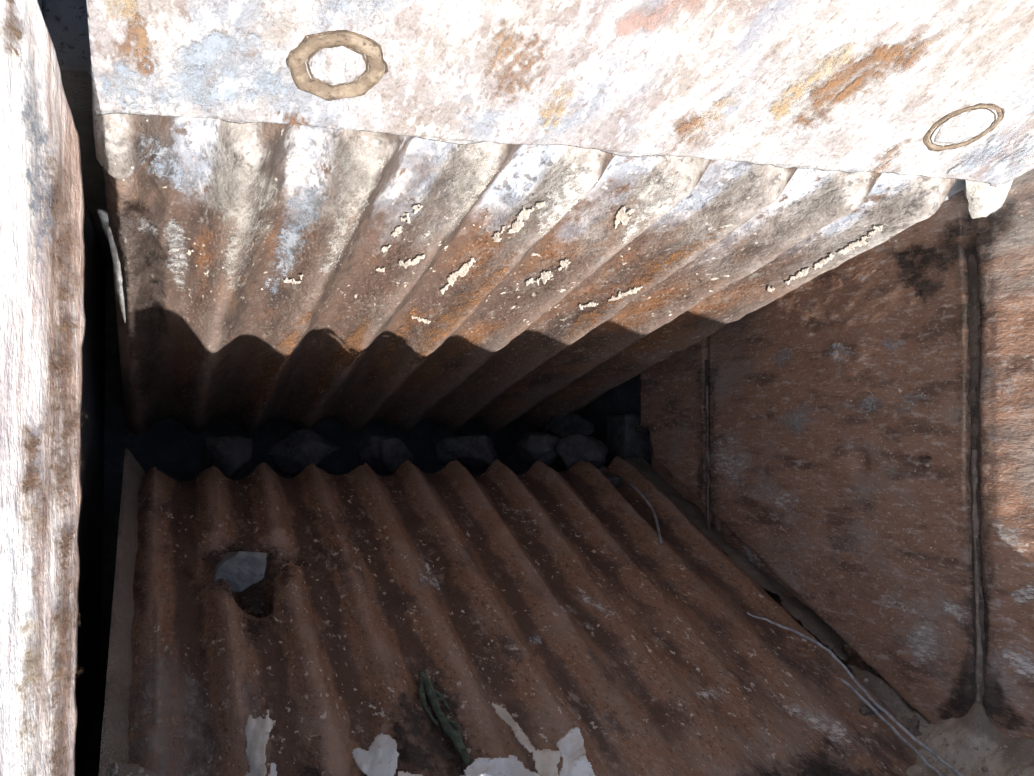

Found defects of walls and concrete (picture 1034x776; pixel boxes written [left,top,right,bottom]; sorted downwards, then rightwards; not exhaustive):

rust [108,0,157,78]
rust [771,38,928,130]
rust [284,114,307,130]
rust [673,98,732,151]
peeling [381,204,423,253]
peeling [491,201,546,242]
peeling [398,254,425,269]
peeling [440,257,476,295]
peeling [525,258,571,286]
peeling [578,286,643,310]
rust [553,229,722,351]
water stain [893,250,947,300]